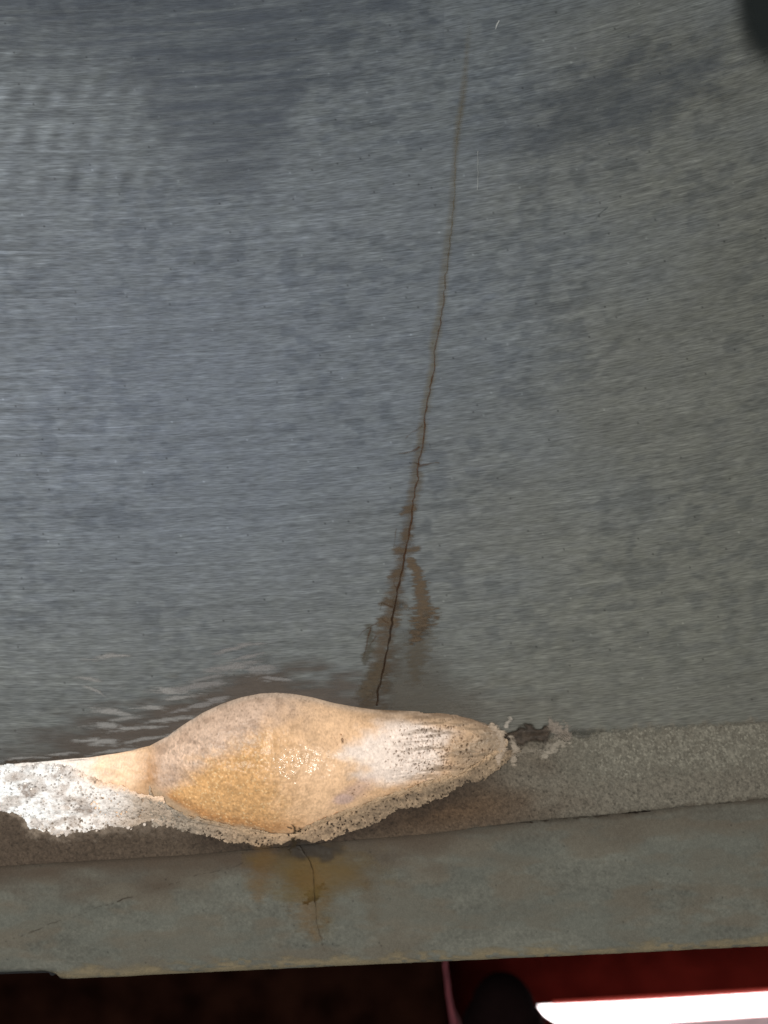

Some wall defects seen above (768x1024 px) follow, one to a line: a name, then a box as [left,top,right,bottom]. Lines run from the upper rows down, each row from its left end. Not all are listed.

crack [368,254,449,706]
peeling [76,644,290,753]
leakage [389,667,469,718]